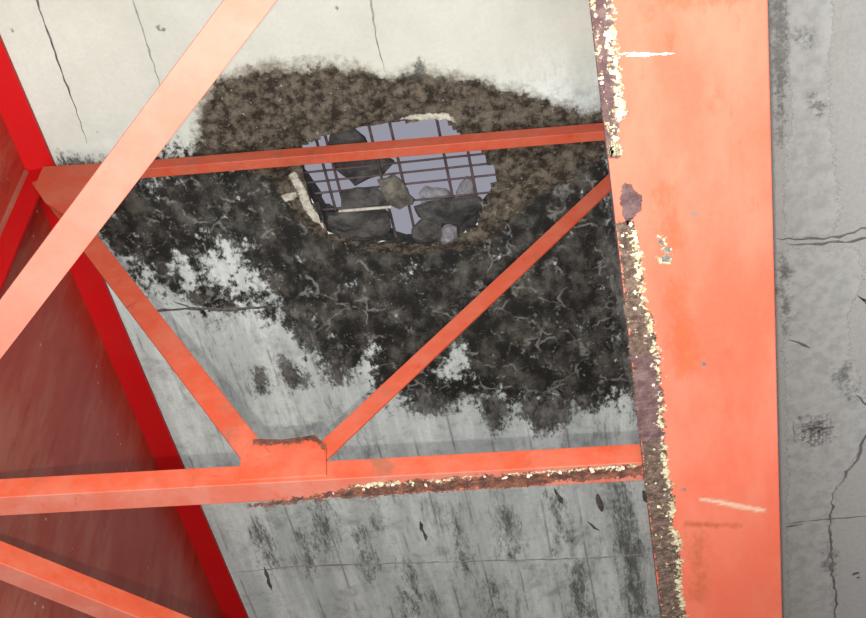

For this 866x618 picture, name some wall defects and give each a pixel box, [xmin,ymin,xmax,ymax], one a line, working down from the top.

crack [36,0,87,142]
crack [132,0,160,86]
crack [370,0,384,67]
damp [402,58,424,79]
damp [58,153,100,166]
damp [155,143,199,160]
spalling [195,0,628,255]
damp [99,155,609,395]
damp [398,191,637,438]
crack [776,227,866,246]
peeling [615,182,686,618]
rust [243,464,643,508]